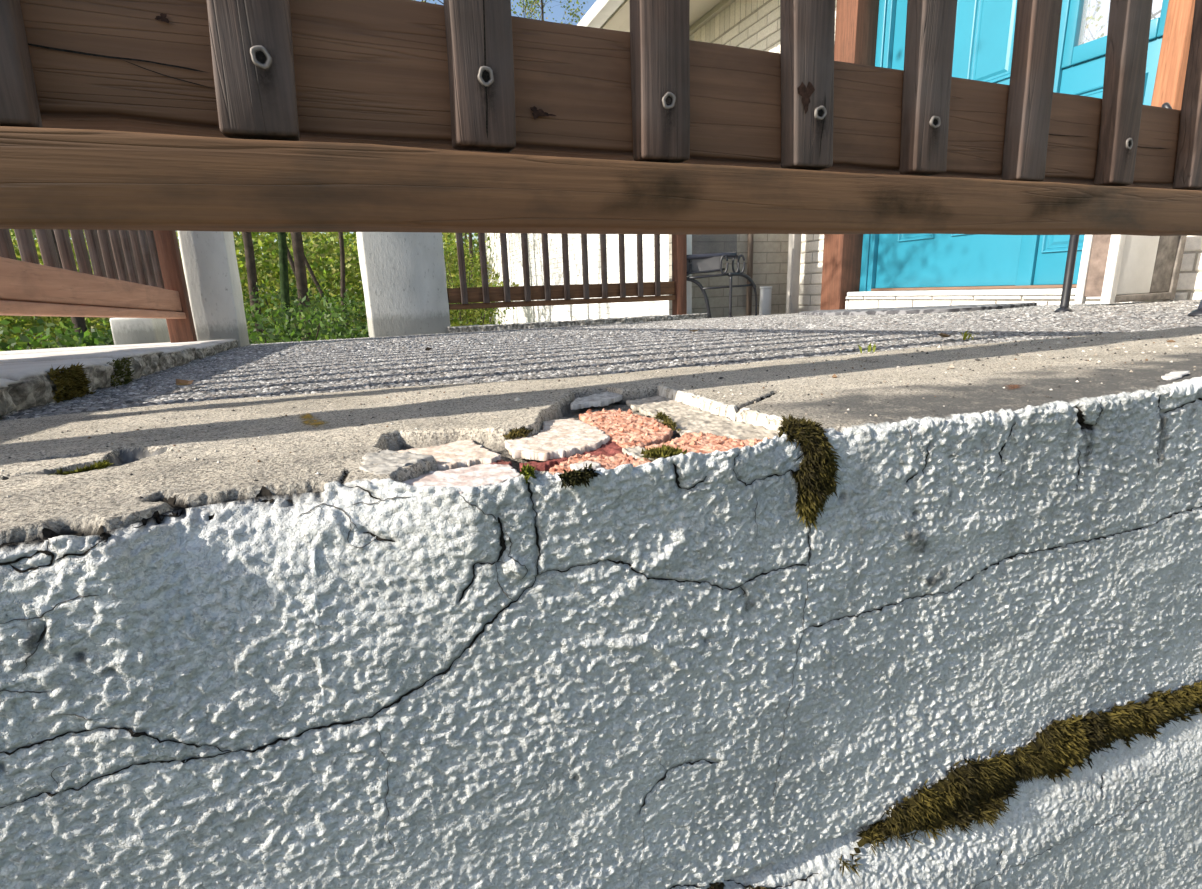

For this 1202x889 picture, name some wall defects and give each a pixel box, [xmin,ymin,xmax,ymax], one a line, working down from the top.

spalling [27,446,170,475]
spalling [359,385,787,494]
crack [673,454,794,542]
crack [906,426,930,483]
crack [1075,403,1103,492]
crack [1152,391,1202,463]
crack [0,471,1202,857]
crack [638,754,719,884]
crack [979,775,1202,884]
crack [670,873,819,889]